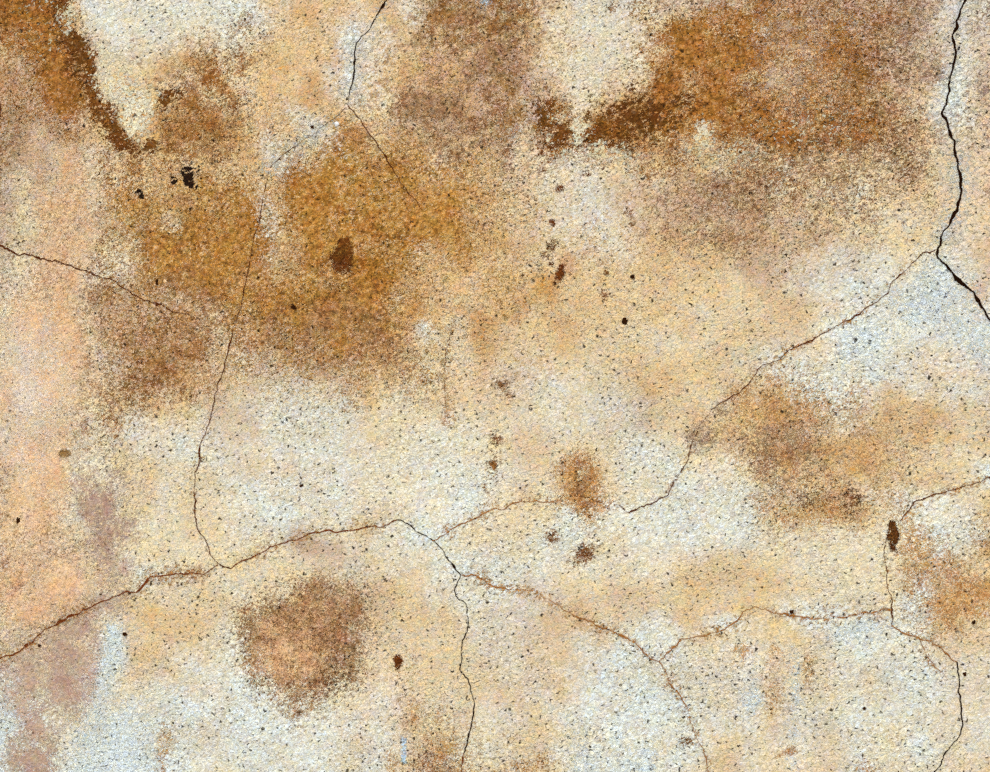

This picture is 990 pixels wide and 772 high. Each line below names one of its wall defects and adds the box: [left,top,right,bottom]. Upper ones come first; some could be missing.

crack [254,0,422,210]
corrosion [0,0,978,431]
crack [571,0,990,521]
crack [0,182,963,772]
corrosion [541,438,616,575]